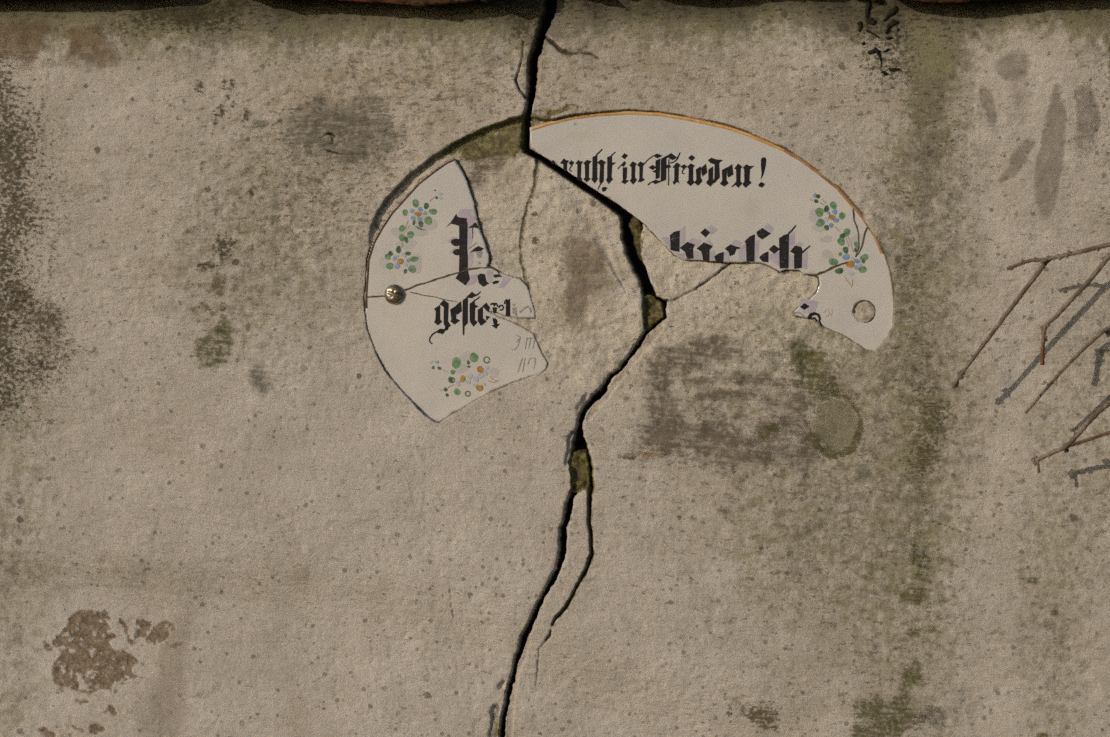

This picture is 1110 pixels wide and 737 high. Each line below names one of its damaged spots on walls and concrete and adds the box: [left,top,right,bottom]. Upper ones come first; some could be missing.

water stain [0,23,86,431]
crack [497,0,733,737]
peeling [37,612,184,737]